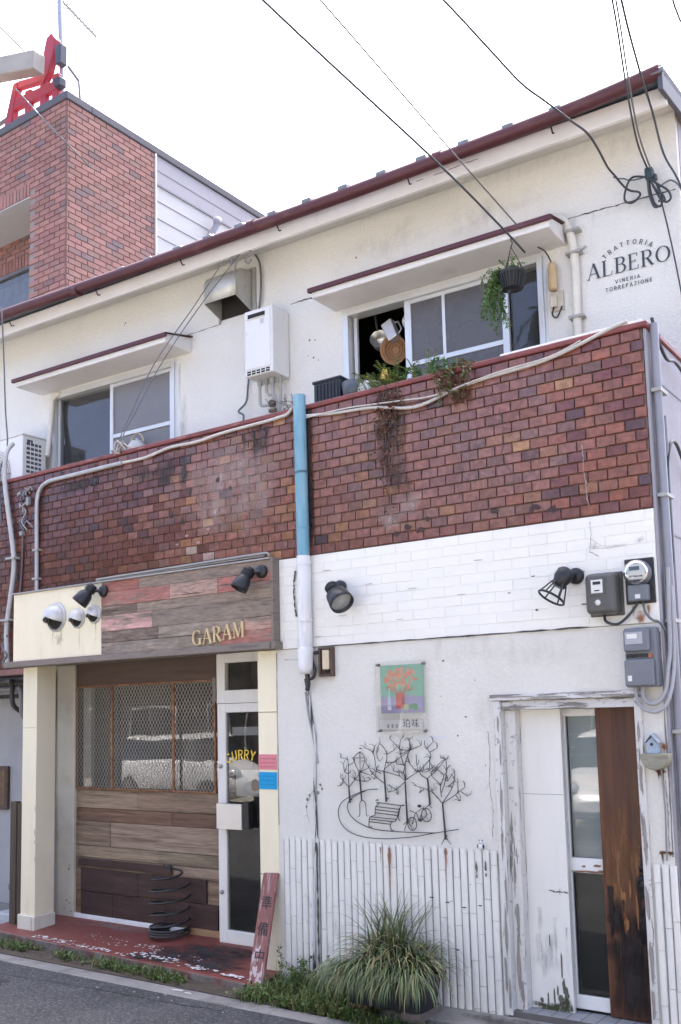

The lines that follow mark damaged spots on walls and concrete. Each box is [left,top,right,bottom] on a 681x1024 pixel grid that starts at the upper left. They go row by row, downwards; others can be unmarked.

peeling [500,780,525,1008]
peeling [540,954,570,1007]